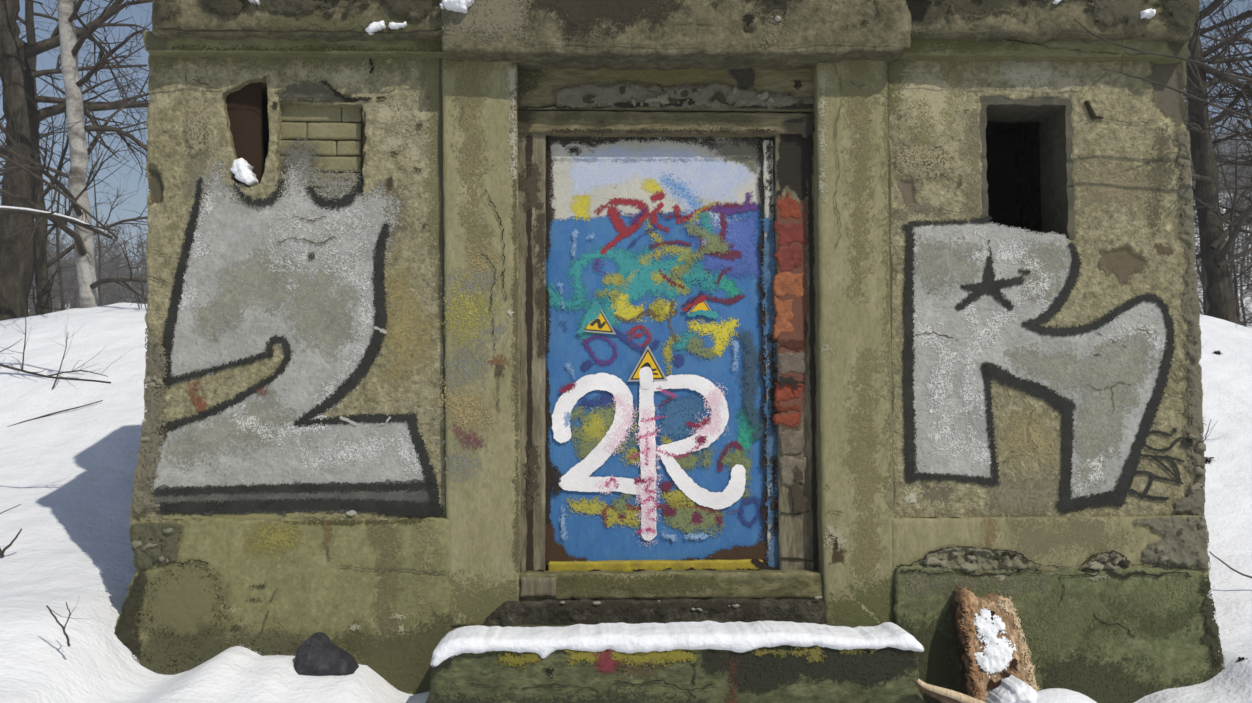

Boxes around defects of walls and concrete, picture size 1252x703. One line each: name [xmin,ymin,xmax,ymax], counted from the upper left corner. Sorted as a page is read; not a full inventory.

spalling [272,60,439,191]
water stain [1075,119,1180,233]
crack [481,190,507,412]
spalling [506,66,834,488]
peeling [522,444,541,515]
spalling [921,544,1044,581]